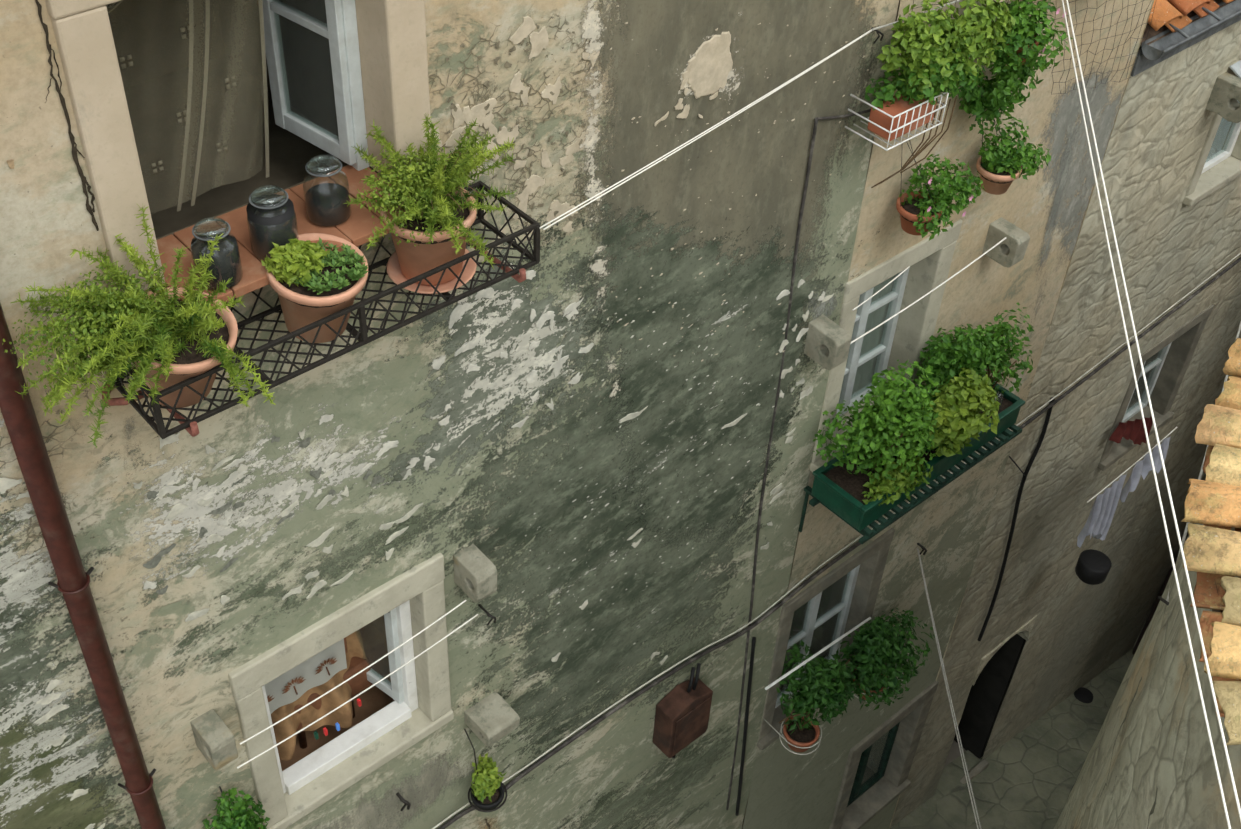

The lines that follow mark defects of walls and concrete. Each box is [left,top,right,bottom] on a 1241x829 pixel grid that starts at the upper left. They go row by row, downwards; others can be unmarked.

crack [35,0,99,231]
peeling [654,31,740,127]
water stain [568,0,875,347]
water stain [1039,71,1123,270]
peeling [107,16,612,595]
peeling [619,406,648,423]
peeling [0,418,48,570]
water stain [142,545,201,605]
peeling [282,570,354,600]
peeling [33,679,69,726]
water stain [0,505,109,829]
peeling [70,789,88,801]